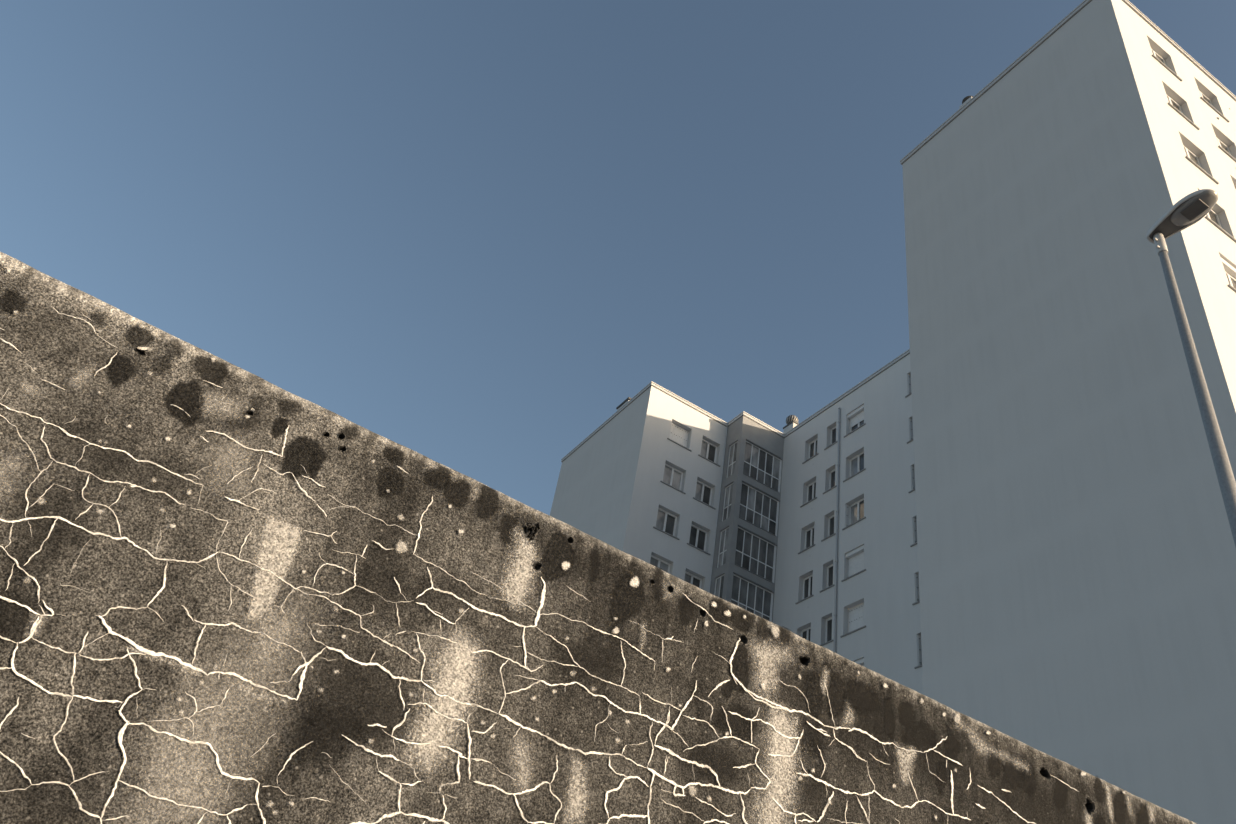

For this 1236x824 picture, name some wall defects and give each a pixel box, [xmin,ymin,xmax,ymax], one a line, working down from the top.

crack [51,306,117,375]
damp [108,325,153,386]
damp [164,357,227,426]
damp [271,400,327,480]
damp [377,447,404,497]
damp [247,517,301,621]
damp [424,467,574,610]
crack [0,328,1036,824]
damp [610,568,665,623]
damp [298,629,481,770]
damp [679,597,959,824]
damp [1086,777,1154,824]